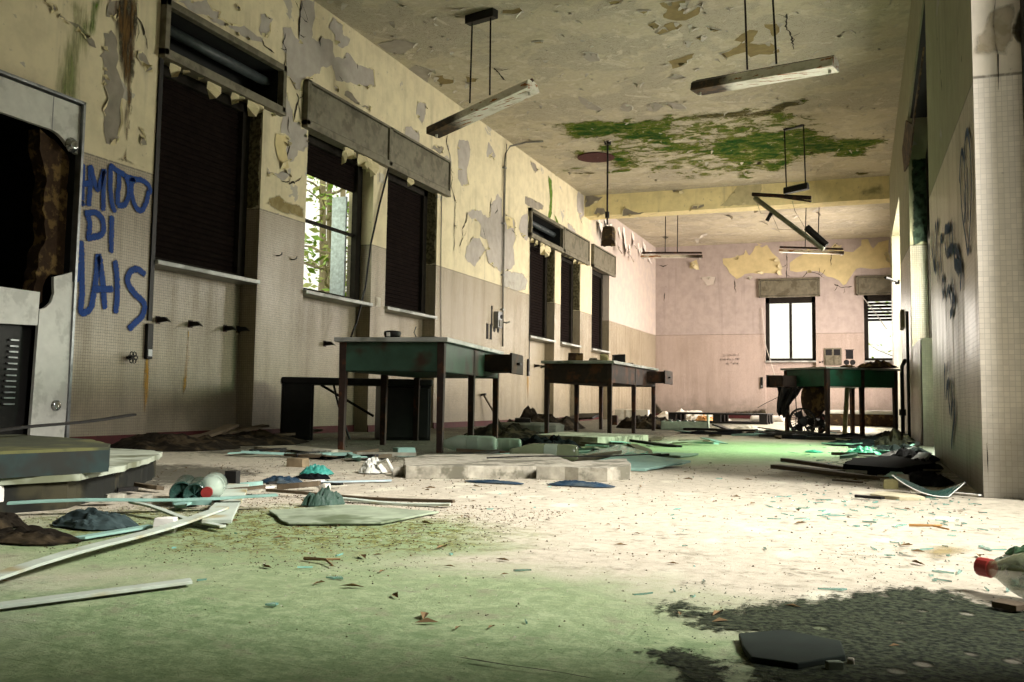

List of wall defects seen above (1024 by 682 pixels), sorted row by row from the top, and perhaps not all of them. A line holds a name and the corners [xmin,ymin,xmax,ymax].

peeling [44,0,124,145]
corrosion [115,0,138,124]
peeling [137,51,154,72]
peeling [169,0,379,181]
peeling [597,0,784,194]
crack [778,14,800,49]
peeling [465,124,652,273]
peeling [723,239,891,285]